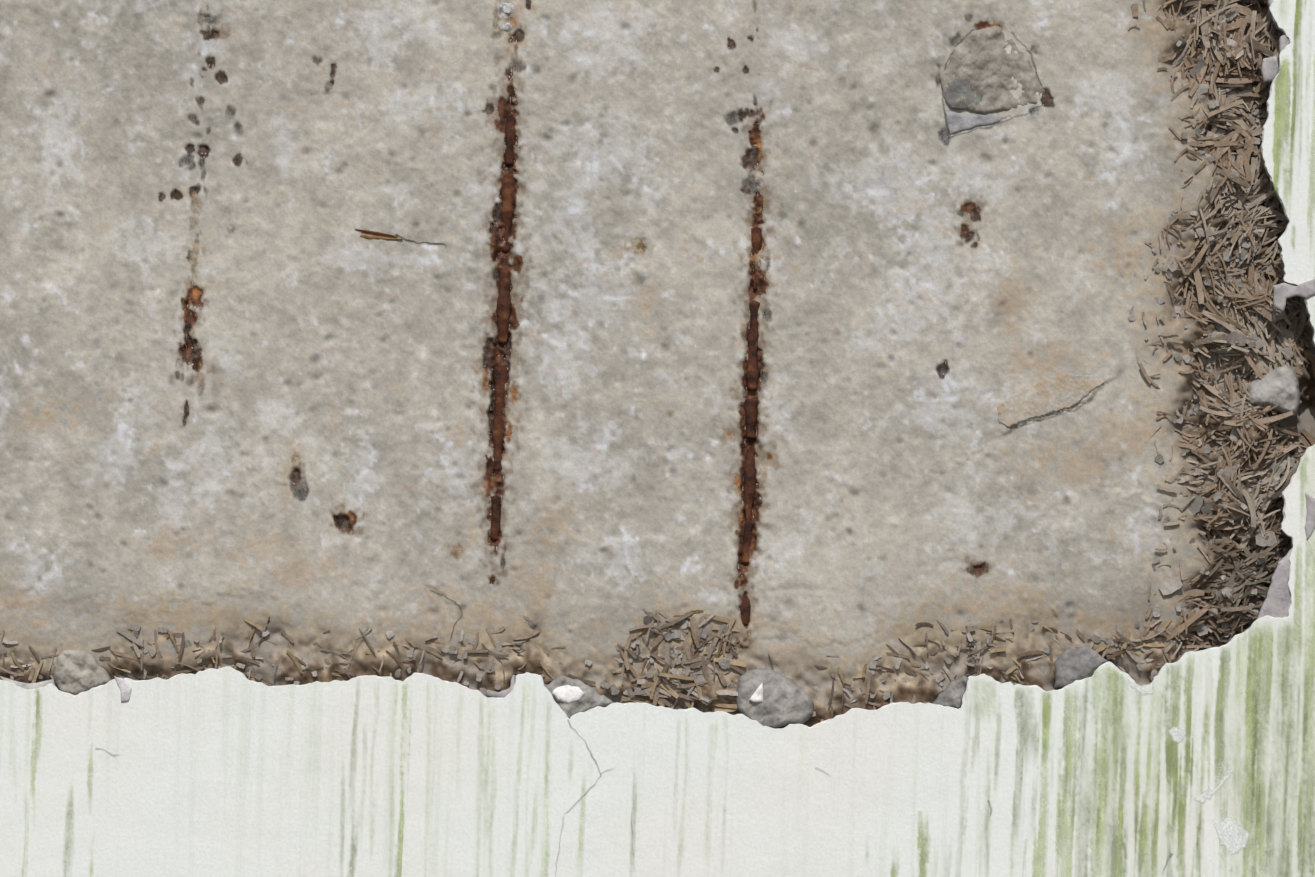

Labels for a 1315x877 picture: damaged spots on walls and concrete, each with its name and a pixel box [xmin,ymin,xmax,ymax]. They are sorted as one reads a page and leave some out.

rust [159,57,228,227]
spalling [936,15,1054,145]
peeling [1261,35,1290,83]
damp [1273,0,1302,188]
rust [175,282,206,389]
rust [482,0,531,584]
rust [726,98,773,648]
peeling [1272,279,1315,312]
peeling [1255,548,1292,621]
damp [1027,702,1081,877]
damp [1096,666,1201,877]
damp [1215,652,1230,775]